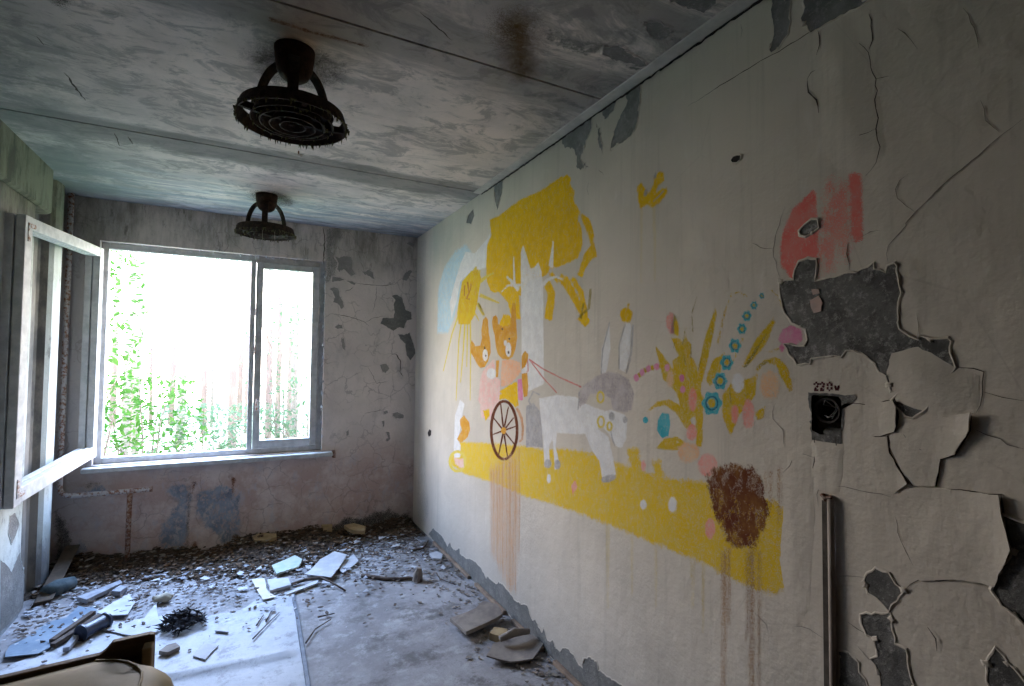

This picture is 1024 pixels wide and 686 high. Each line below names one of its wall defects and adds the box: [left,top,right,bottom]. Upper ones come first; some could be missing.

peeling [561,85,642,171]
crack [691,6,887,173]
crack [846,100,1024,267]
peeling [240,254,375,450]
peeling [379,293,416,361]
spalling [778,256,1024,626]
peeling [428,528,623,686]
peeling [837,566,917,686]
peeling [980,645,1024,686]